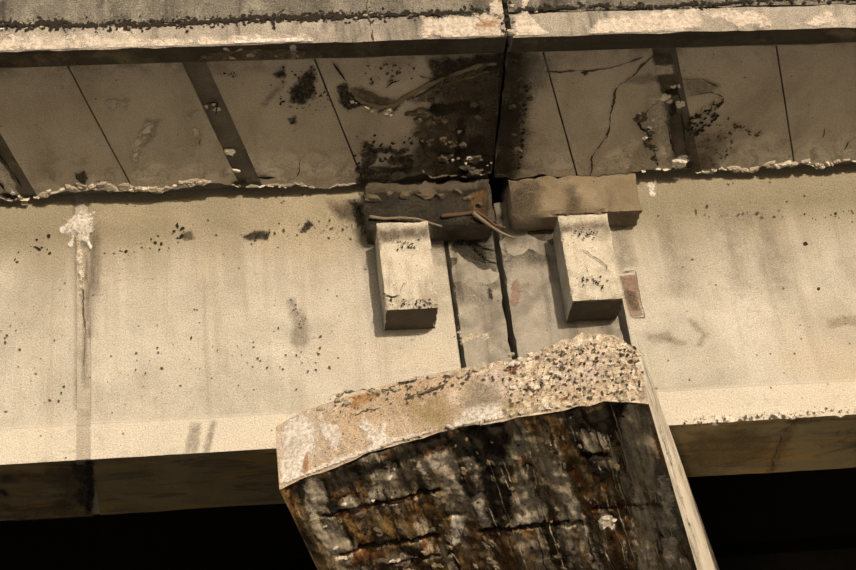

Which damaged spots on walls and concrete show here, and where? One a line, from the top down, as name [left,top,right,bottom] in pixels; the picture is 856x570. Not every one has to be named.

water stain [223,37,313,59]
water stain [274,66,360,124]
water stain [354,52,554,244]
rust [350,392,372,407]
spalling [317,342,644,416]
spalling [419,415,631,570]